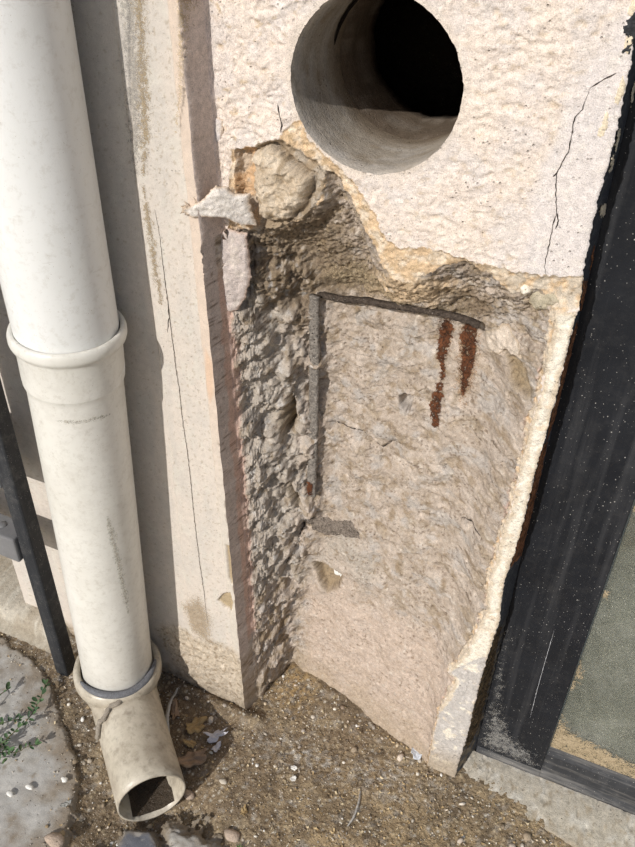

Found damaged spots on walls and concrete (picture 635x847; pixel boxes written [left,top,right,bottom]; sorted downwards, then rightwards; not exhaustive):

crack [544,73,616,273]
spalling [157,121,584,778]
corrosion [429,319,477,428]
corrosion [511,323,578,567]